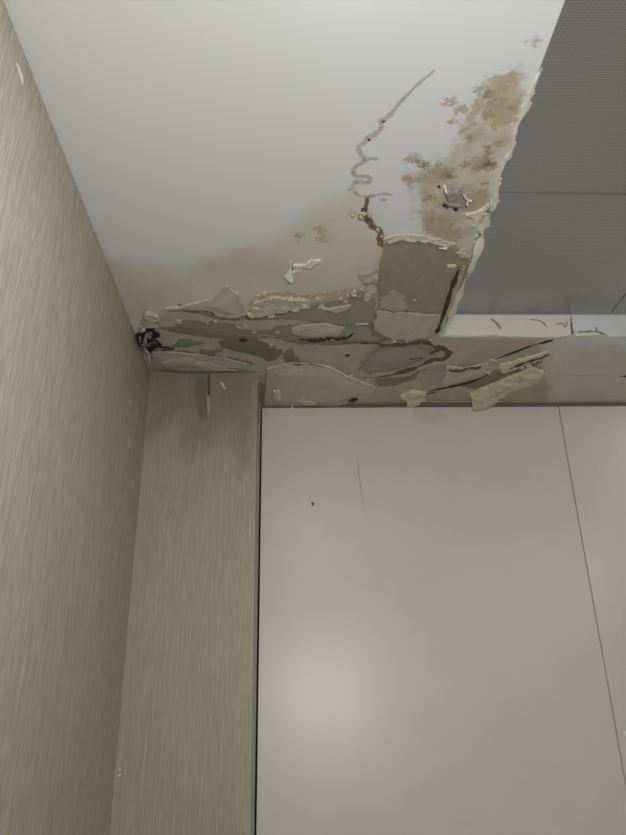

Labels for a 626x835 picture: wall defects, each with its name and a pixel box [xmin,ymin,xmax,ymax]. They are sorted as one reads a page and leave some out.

damp [96,48,626,406]
flaking render [140,67,608,364]
peeling [400,350,549,412]